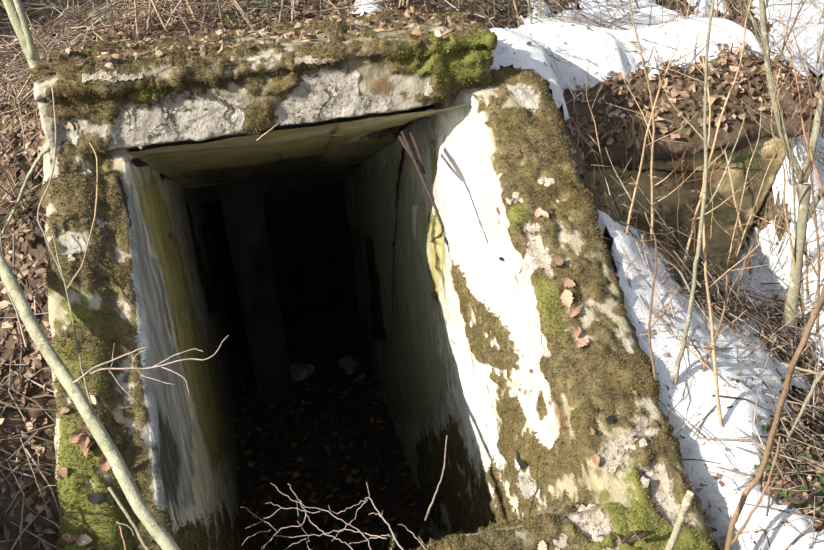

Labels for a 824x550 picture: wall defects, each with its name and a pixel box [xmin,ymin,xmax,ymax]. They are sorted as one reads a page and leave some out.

crack [119,104,139,131]
crack [151,101,189,134]
crack [214,97,242,132]
crack [310,88,337,120]
crack [391,147,404,344]